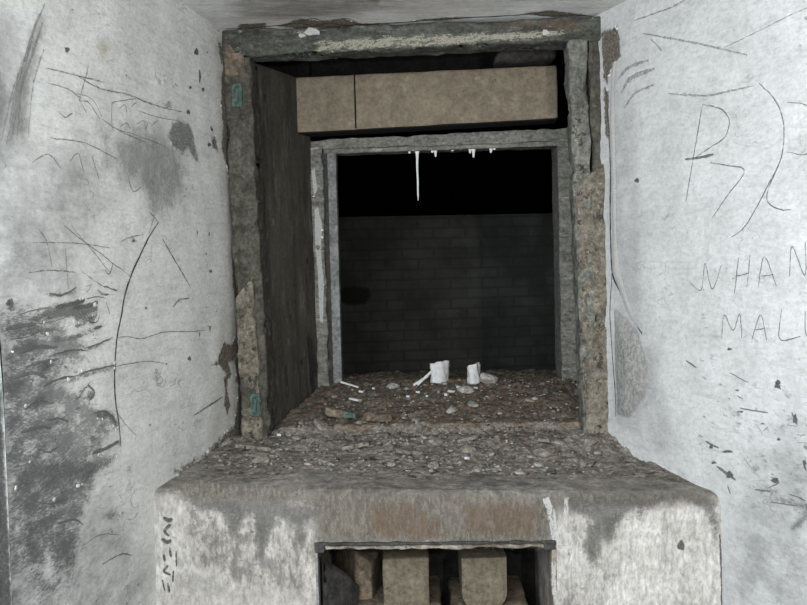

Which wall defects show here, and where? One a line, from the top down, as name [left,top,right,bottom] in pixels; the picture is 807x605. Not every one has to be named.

spalling [174,322,242,476]
damp [177,482,705,545]
damp [585,518,615,561]